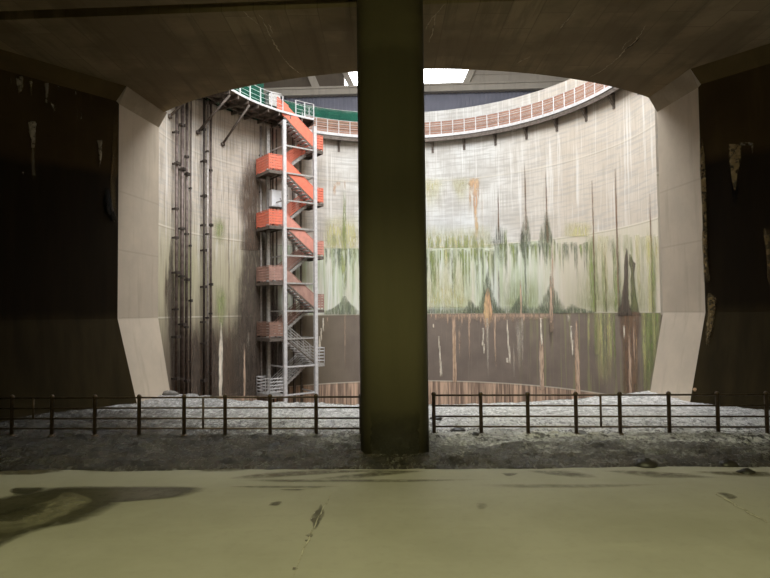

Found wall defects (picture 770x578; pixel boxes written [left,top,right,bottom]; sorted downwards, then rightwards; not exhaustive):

peeling [28,121,37,148]
corrosion [469,179,479,230]
peeling [729,142,753,200]
water stain [165,164,283,396]
water stain [325,213,359,282]
water stain [427,181,592,394]
water stain [595,251,655,394]